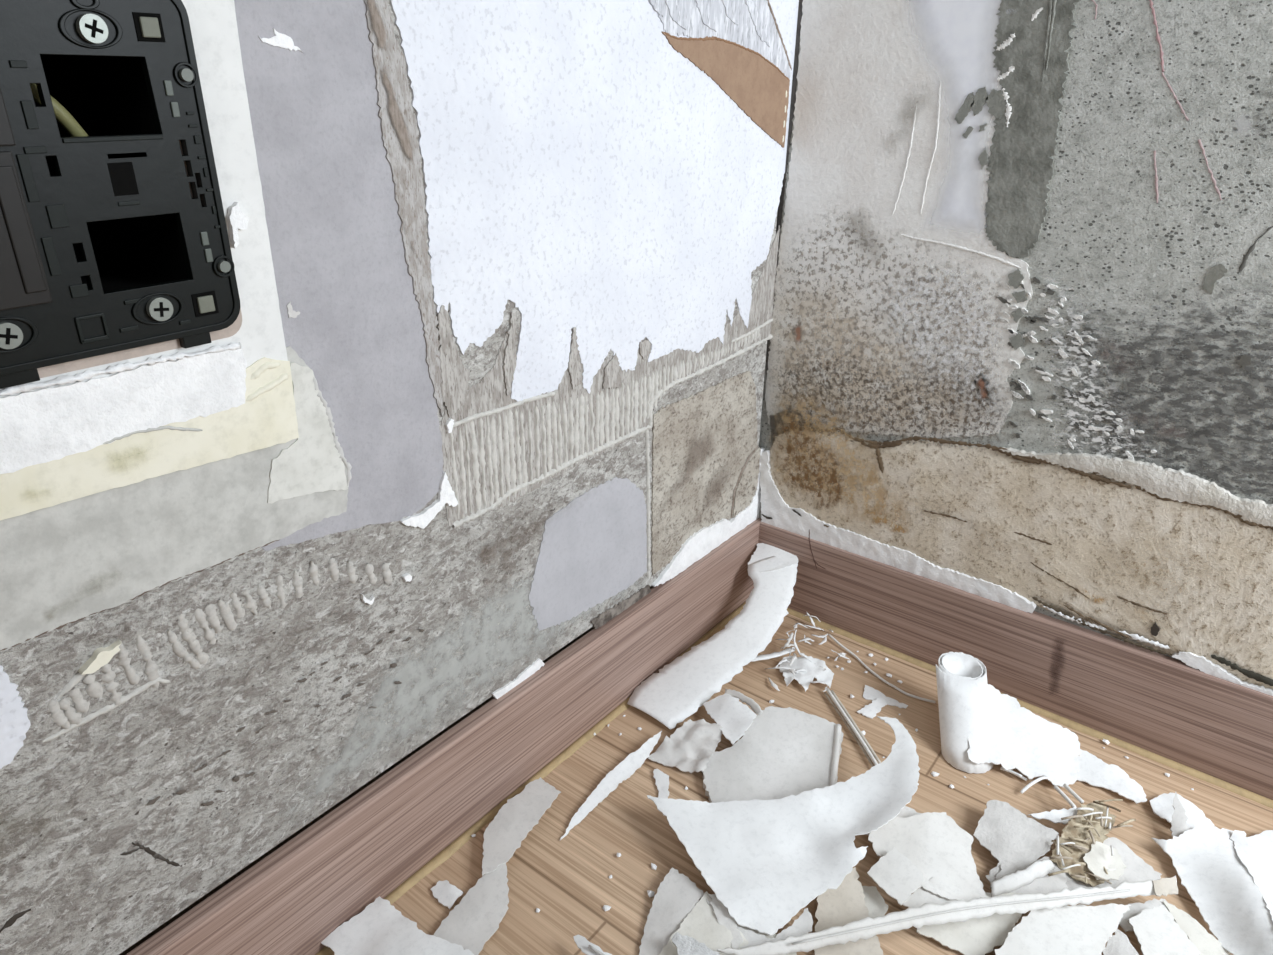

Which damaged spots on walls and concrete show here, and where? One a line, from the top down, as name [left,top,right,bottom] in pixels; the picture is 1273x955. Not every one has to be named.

peeling [390,0,799,402]
damp [778,217,1006,444]
spalling [1202,264,1228,294]
crack [1239,226,1273,273]
peeling [996,277,1273,527]
damp [1052,287,1273,504]
peeling [400,471,458,529]
spalling [528,371,761,631]
peeling [0,665,31,769]
peeling [78,639,122,675]
peeling [491,658,545,699]
peeling [857,685,908,719]